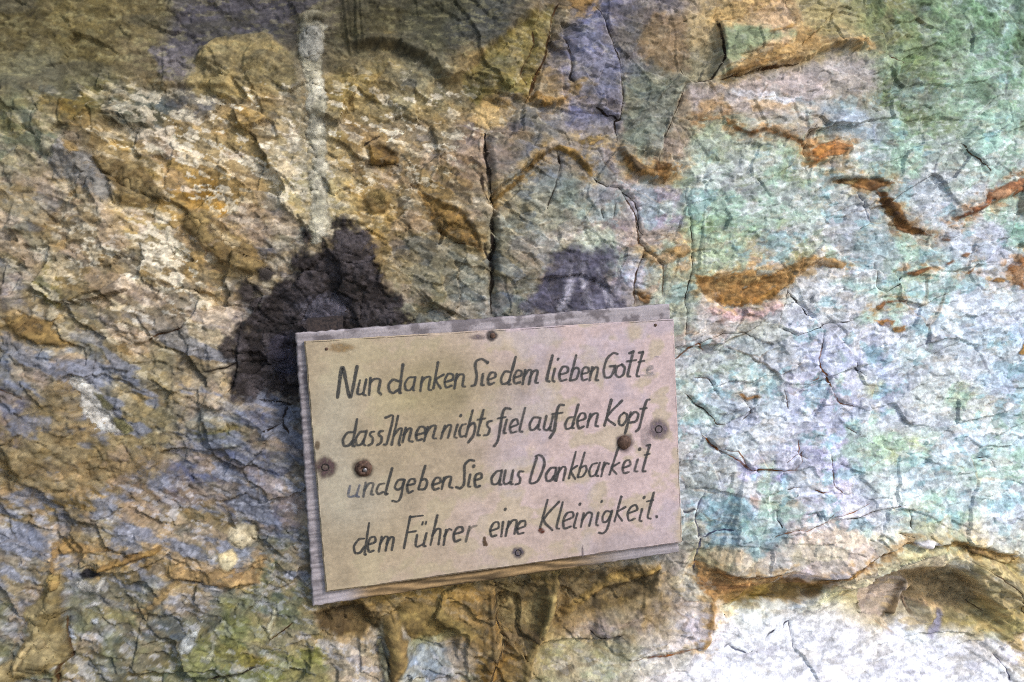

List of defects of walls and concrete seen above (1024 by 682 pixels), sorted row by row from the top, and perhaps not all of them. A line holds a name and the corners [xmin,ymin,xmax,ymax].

crack [659,21,799,160]
crack [437,133,496,314]
leakage [519,245,626,313]
crack [593,177,760,359]
crack [784,291,861,435]
crack [686,377,915,538]